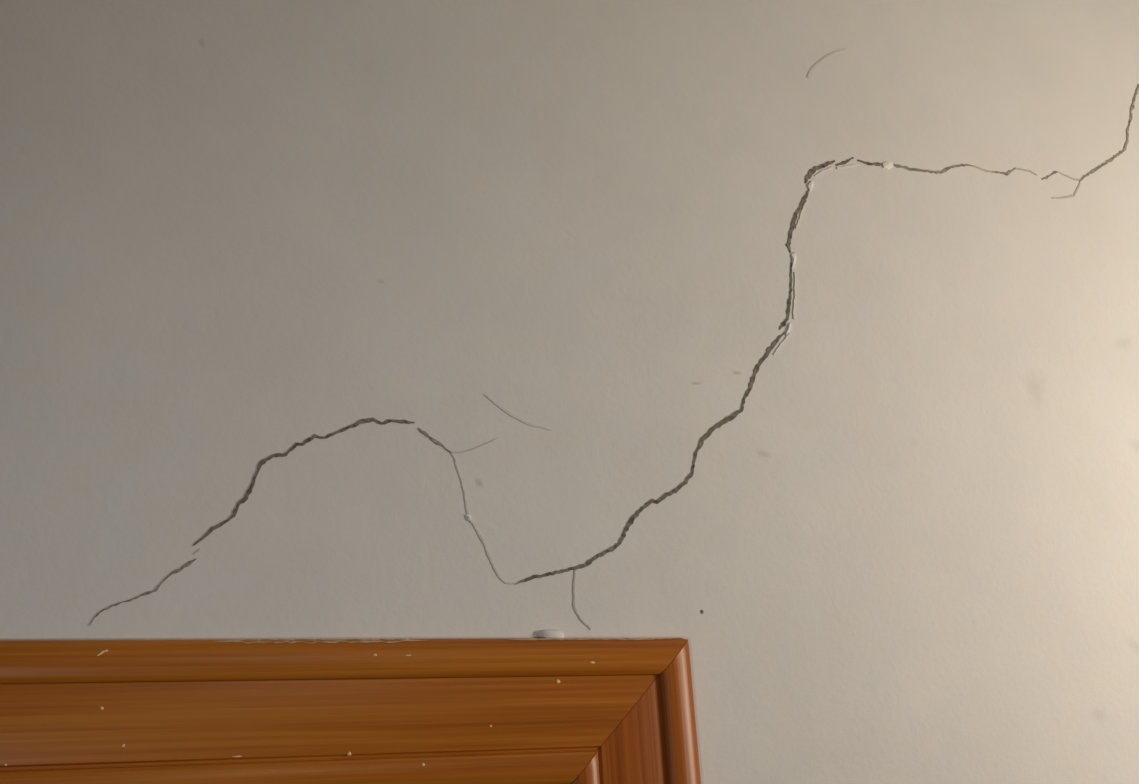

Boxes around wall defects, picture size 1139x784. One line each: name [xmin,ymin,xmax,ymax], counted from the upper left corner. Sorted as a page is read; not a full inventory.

crack [90,84,1139,630]